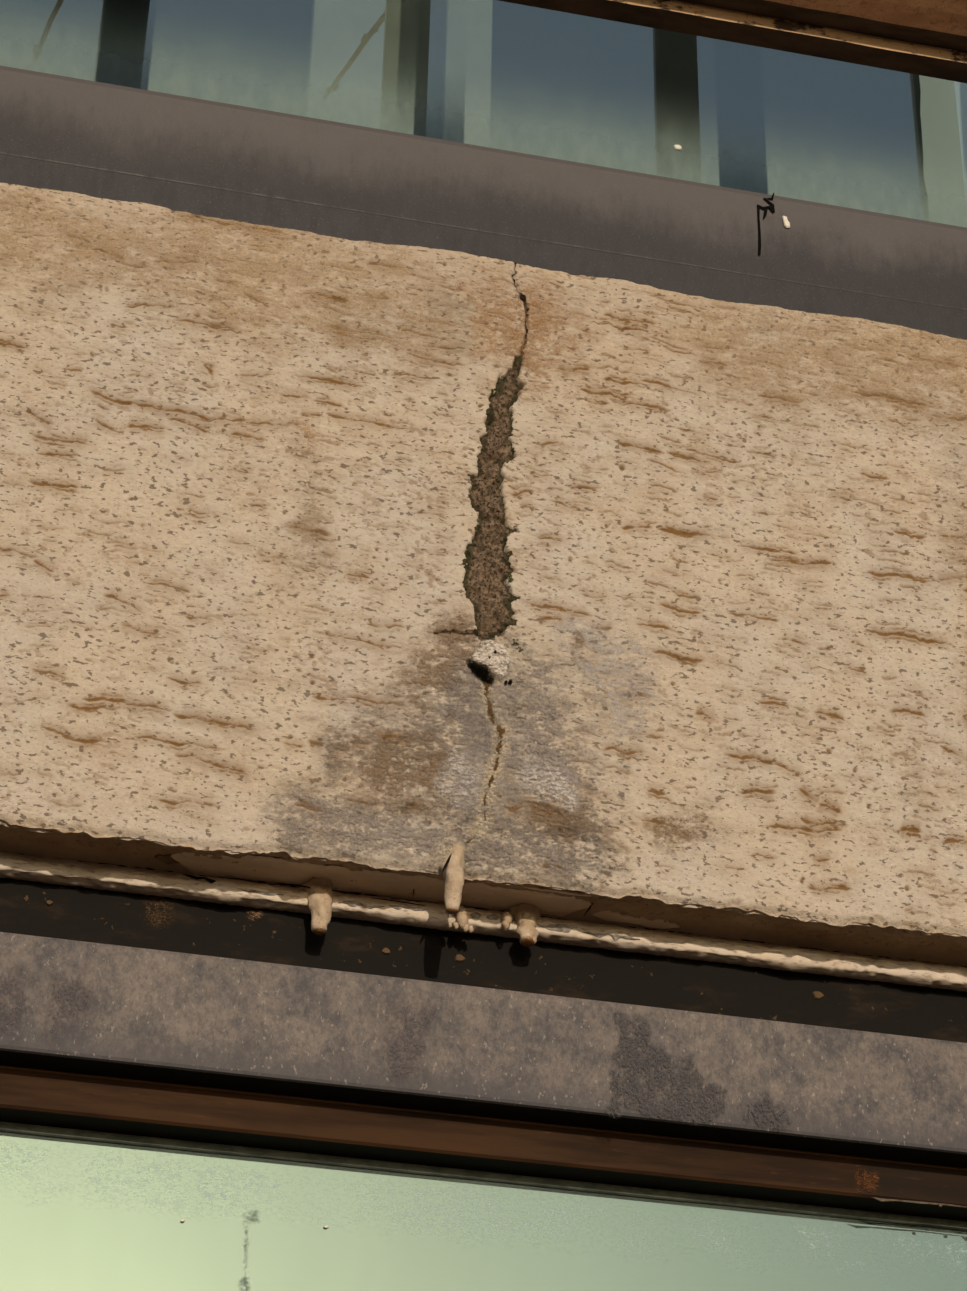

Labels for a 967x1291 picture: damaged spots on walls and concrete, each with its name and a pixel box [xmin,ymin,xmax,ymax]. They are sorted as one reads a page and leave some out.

leakage [154,620,680,948]
crack [434,262,529,851]